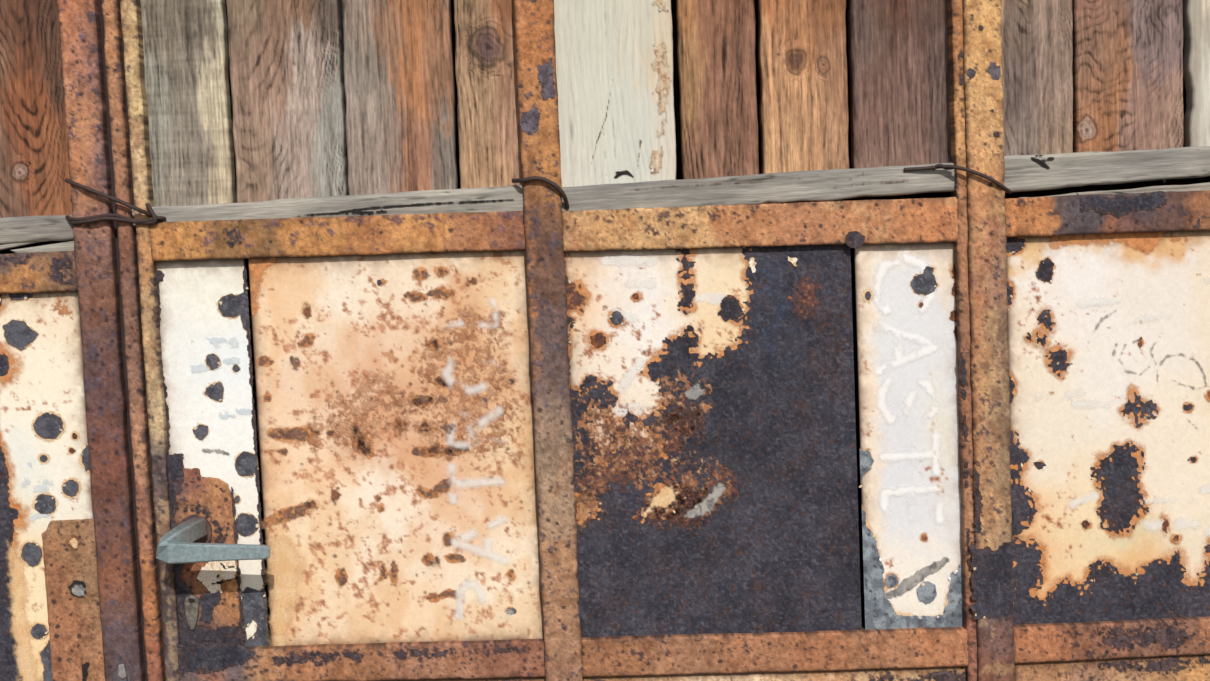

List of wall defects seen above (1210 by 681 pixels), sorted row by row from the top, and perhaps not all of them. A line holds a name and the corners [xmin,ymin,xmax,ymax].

rust [404,266,478,303]
spalling [588,308,625,351]
spalling [717,295,744,326]
rust [0,342,19,386]
rust [267,306,524,468]
spalling [859,449,874,488]
peeling [651,487,675,508]
peeling [685,483,726,518]
rust [0,433,36,681]
rust [262,487,341,646]
rust [422,533,465,565]
peeling [862,509,985,630]